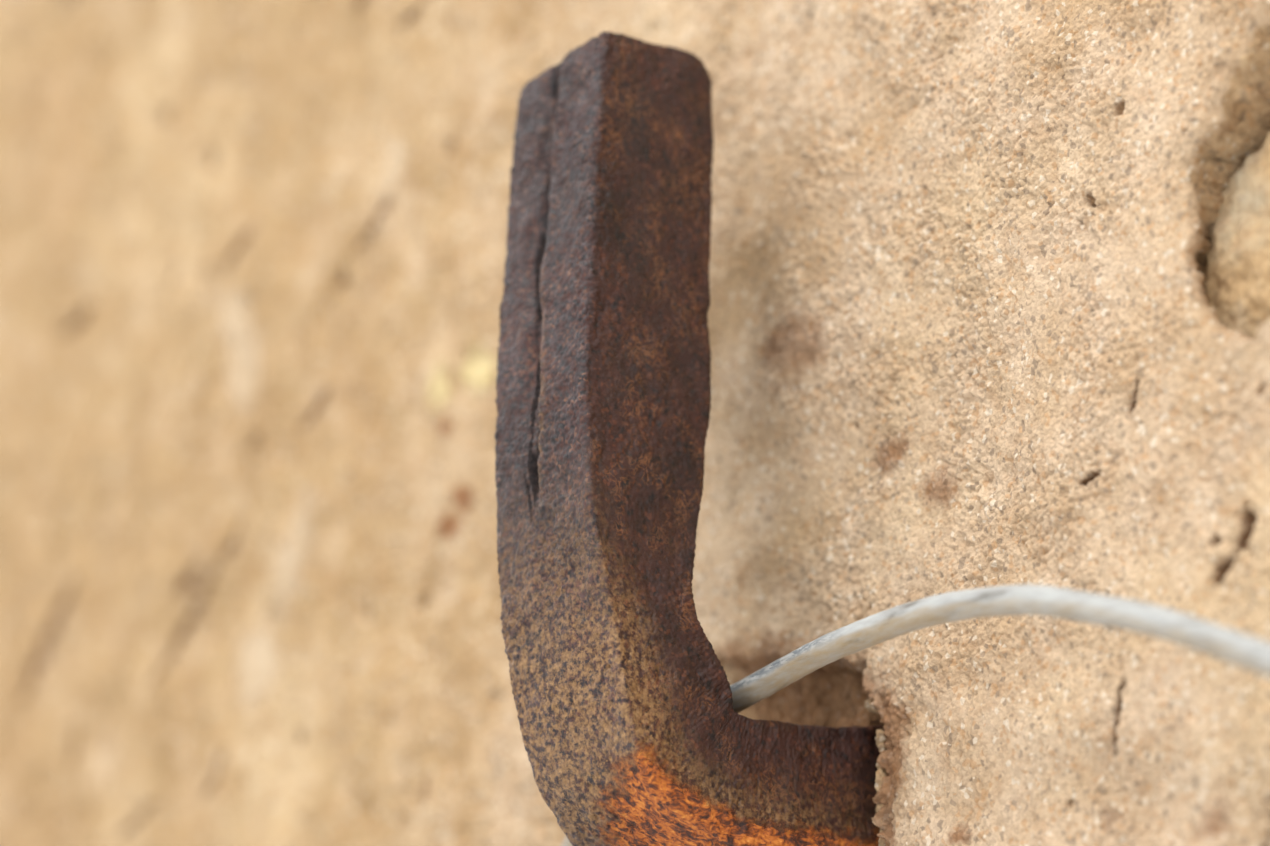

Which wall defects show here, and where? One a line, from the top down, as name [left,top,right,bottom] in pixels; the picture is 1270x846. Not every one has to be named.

spalling [1188,23,1270,340]
rust [602,699,906,846]